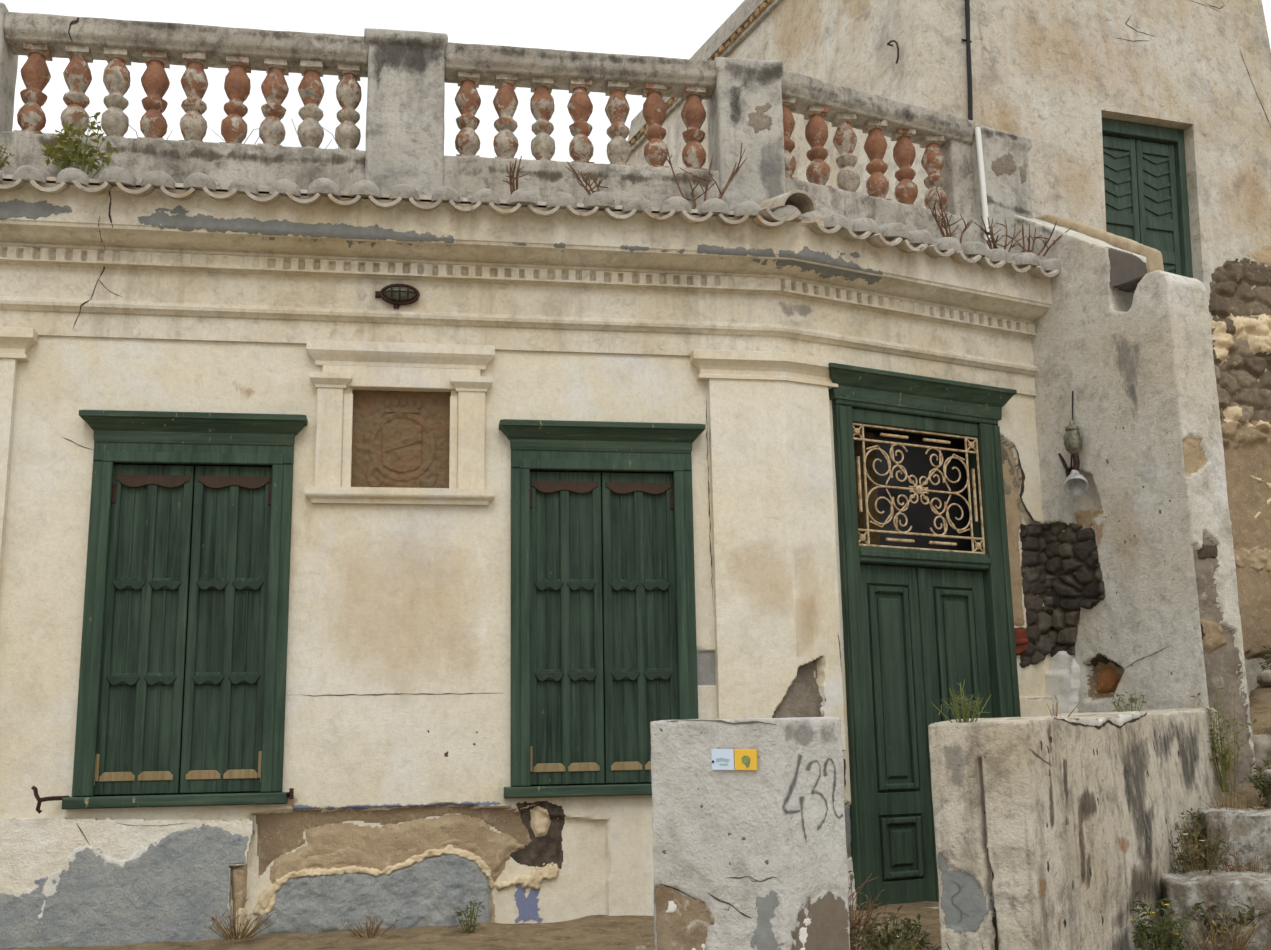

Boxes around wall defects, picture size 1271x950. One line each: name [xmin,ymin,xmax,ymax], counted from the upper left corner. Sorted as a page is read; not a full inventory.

flaking render [772,656,826,718]
peeling [750,759,857,950]